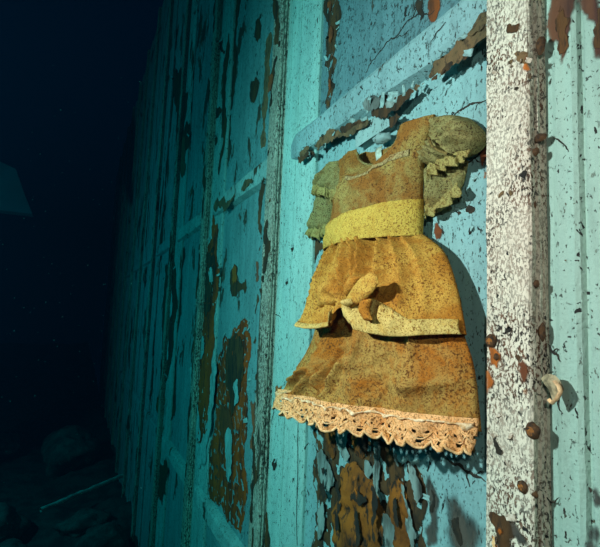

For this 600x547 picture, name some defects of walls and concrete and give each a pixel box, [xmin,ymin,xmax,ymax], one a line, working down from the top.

peeling [164,25,190,177]
peeling [215,0,241,175]
spalling [250,70,259,103]
peeling [298,11,487,164]
crack [366,2,435,72]
peeling [159,247,185,420]
peeling [195,179,253,533]
rust [489,347,500,367]
rust [515,355,528,382]
peeling [311,417,430,547]